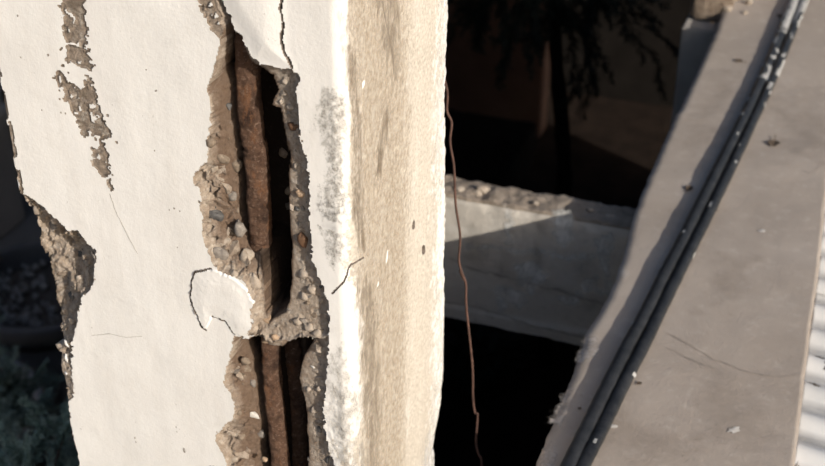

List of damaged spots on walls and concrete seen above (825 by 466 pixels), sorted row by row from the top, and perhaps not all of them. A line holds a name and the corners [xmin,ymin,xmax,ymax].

peeling [3,90,18,158]
peeling [52,0,118,192]
crack [278,0,293,69]
spalling [16,169,97,401]
crack [189,268,235,335]
spalling [193,0,363,466]